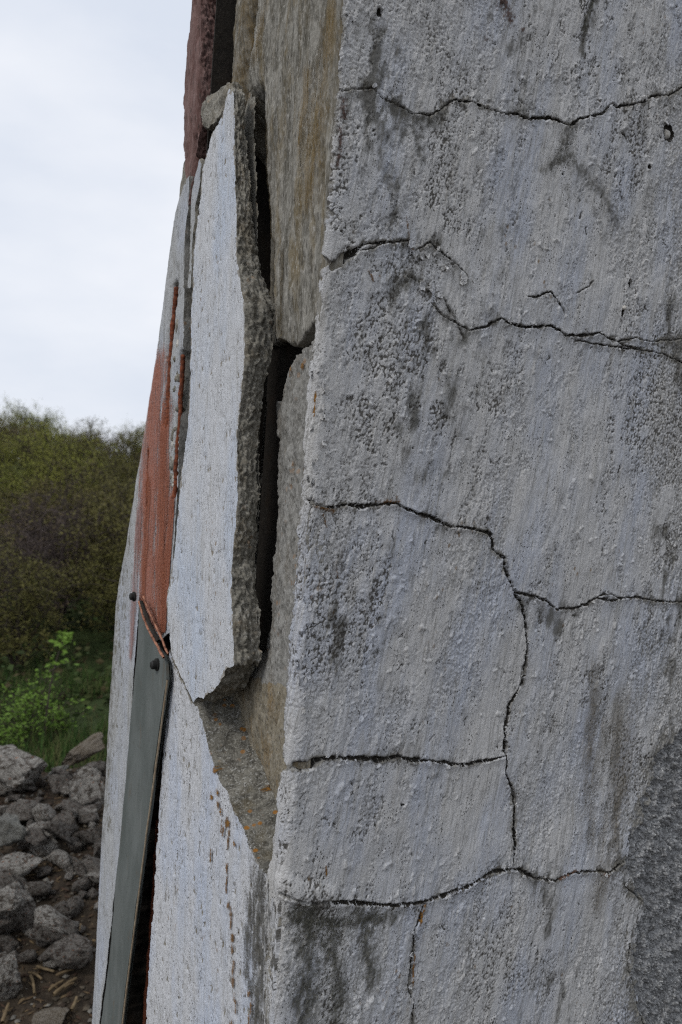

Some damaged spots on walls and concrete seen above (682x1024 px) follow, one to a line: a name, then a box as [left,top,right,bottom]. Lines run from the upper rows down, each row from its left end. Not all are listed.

crack [339,83,682,126]
rust [129,286,185,659]
spalling [159,0,356,874]
crack [331,240,463,271]
crack [409,277,682,363]
spalling [99,893,115,1024]
spalling [126,731,165,1024]
crack [285,500,682,1024]